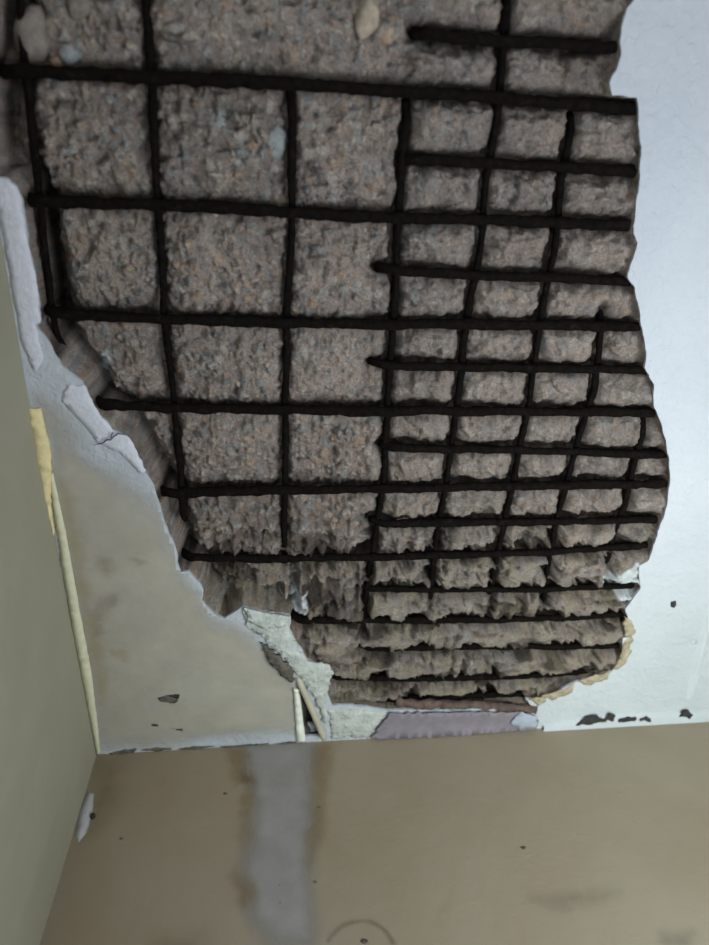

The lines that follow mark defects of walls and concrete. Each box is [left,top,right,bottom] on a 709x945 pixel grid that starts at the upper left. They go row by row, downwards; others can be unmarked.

peeling [109,692,319,754]
spalling [0,0,669,740]